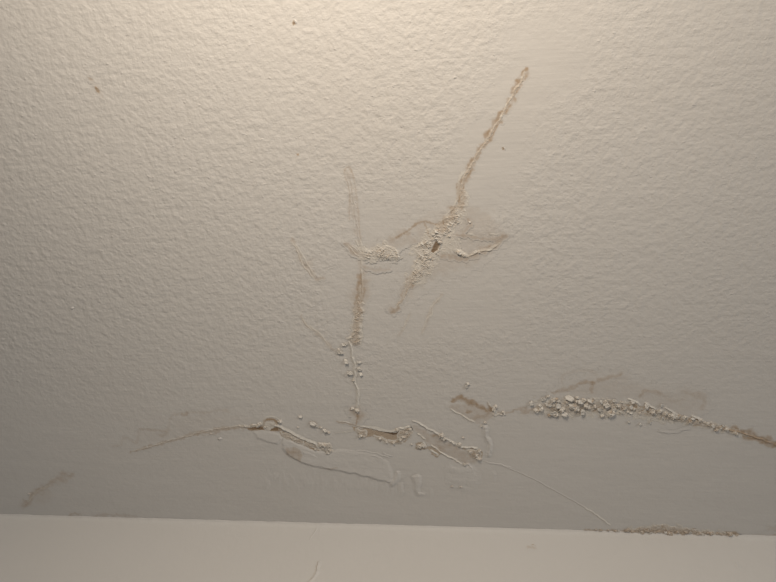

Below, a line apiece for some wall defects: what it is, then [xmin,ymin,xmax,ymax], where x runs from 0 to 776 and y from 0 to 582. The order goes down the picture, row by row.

crack [337,66,531,426]
crack [129,415,334,454]
crack [498,394,776,449]
crack [582,522,740,536]